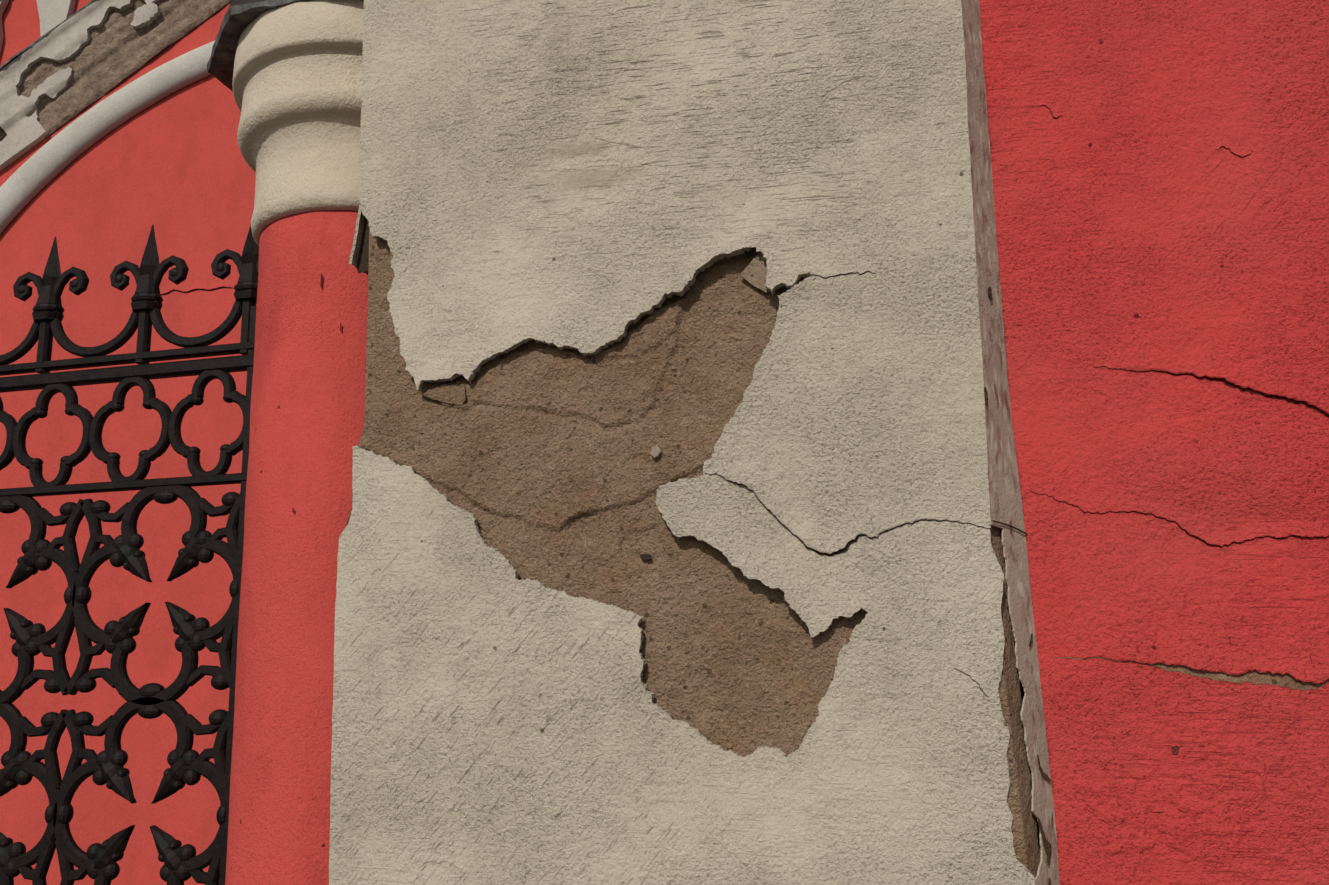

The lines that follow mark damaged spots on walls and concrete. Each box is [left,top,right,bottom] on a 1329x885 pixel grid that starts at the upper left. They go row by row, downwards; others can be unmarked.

flaking render [18,0,231,138]
crack [1093,341,1329,417]
spalling [349,192,868,757]
crack [704,457,1028,556]
crack [1029,487,1329,548]
spalling [990,525,1040,879]
crack [1029,625,1329,691]